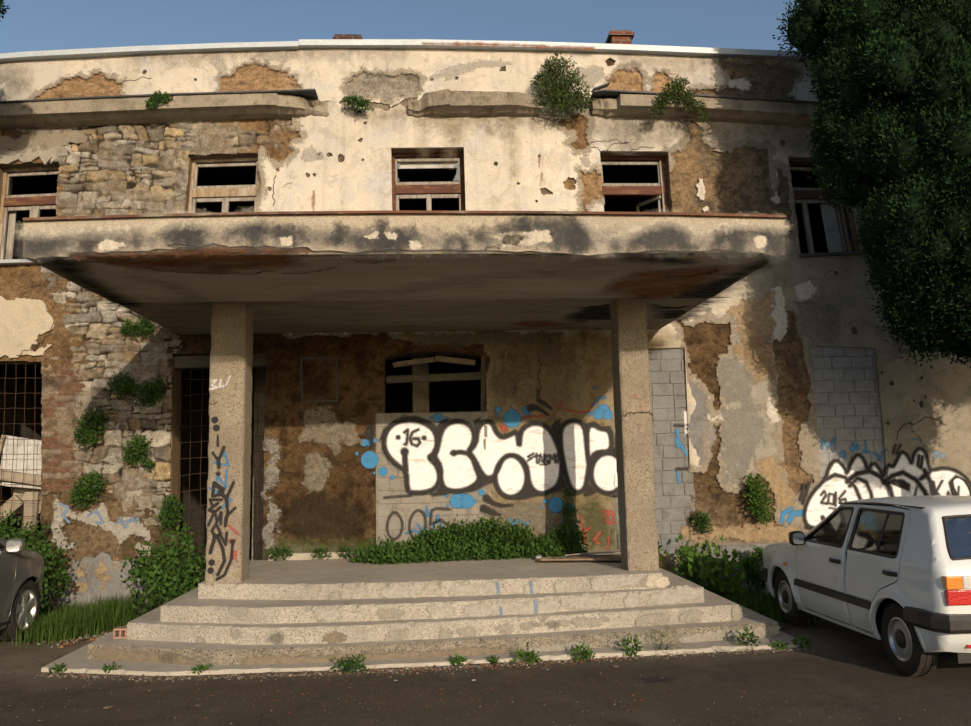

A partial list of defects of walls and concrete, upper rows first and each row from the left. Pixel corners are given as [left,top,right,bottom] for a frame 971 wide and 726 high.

spalling [339,59,511,112]
spalling [575,59,677,93]
spalling [0,118,345,217]
spalling [559,115,604,211]
spalling [664,121,792,249]
rust [74,251,296,271]
spalling [70,236,312,261]
damp [21,215,787,329]
spalling [0,264,211,611]
spalling [253,332,491,560]
spalling [677,280,818,545]
crack [896,417,945,441]